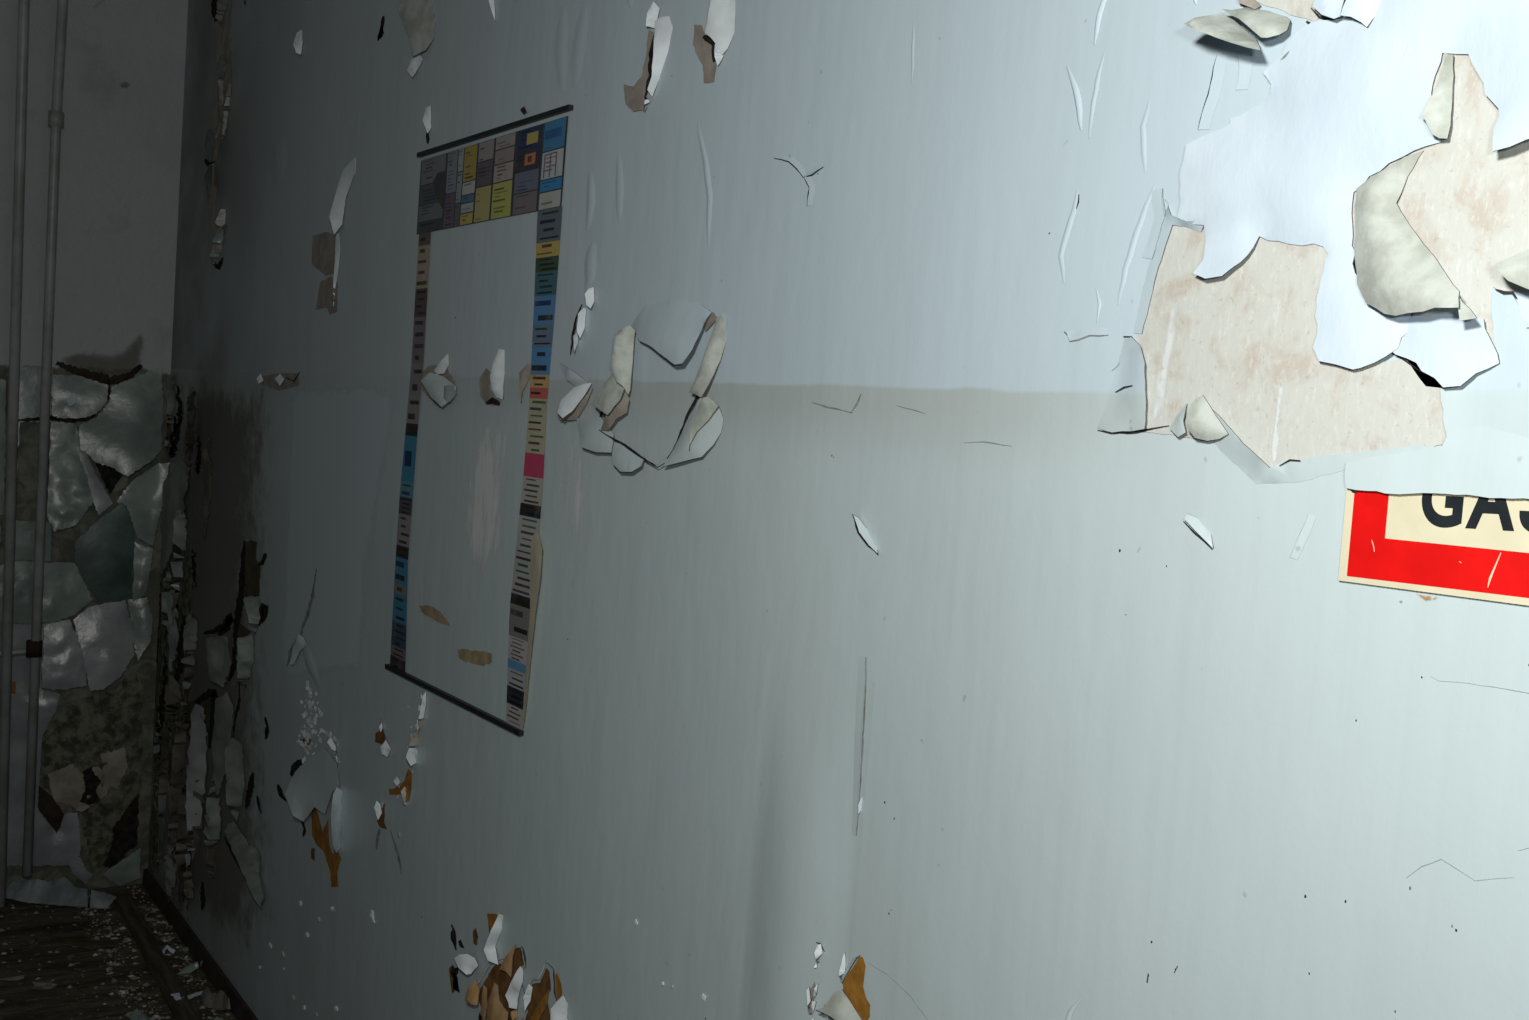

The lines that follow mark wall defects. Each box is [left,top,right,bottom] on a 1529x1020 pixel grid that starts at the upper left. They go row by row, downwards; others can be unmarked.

peeling [624,1,673,112]
peeling [693,0,735,83]
peeling [312,157,356,314]
peeling [1098,0,1529,499]
peeling [479,349,531,406]
peeling [557,242,727,472]
peeling [0,366,268,920]
water stain [179,397,257,912]
peeling [277,569,342,887]
peeling [374,691,427,874]
peeling [449,913,568,1020]
peeling [806,942,870,1020]